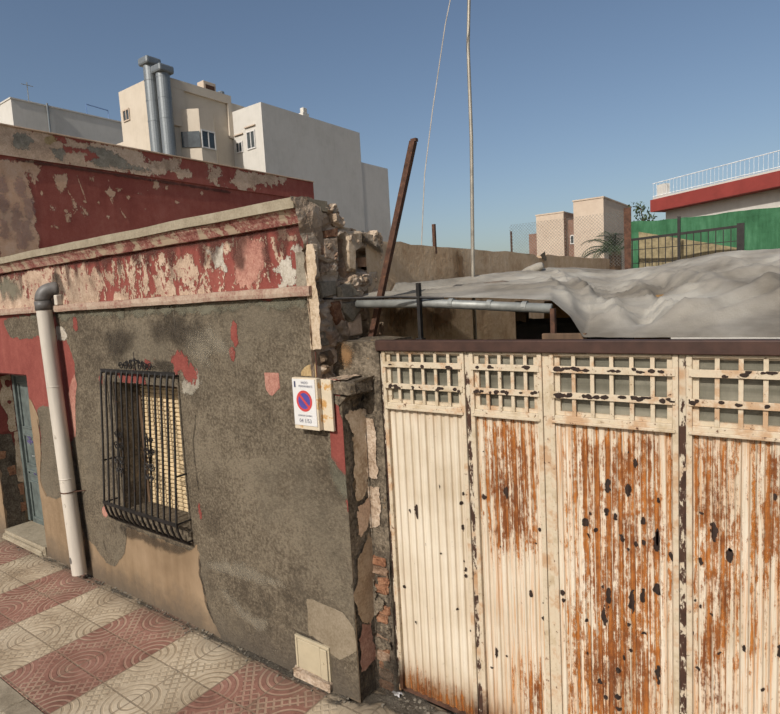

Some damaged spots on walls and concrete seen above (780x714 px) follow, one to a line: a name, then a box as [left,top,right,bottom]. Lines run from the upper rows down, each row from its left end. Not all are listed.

peeling [0,125,192,257]
peeling [206,163,287,192]
spalling [0,196,385,701]
corrosion [477,416,541,563]
flaking render [372,549,396,677]
corrosion [558,425,680,714]
corrosion [693,435,780,714]
corrosion [405,661,473,714]
corrosion [512,659,544,714]